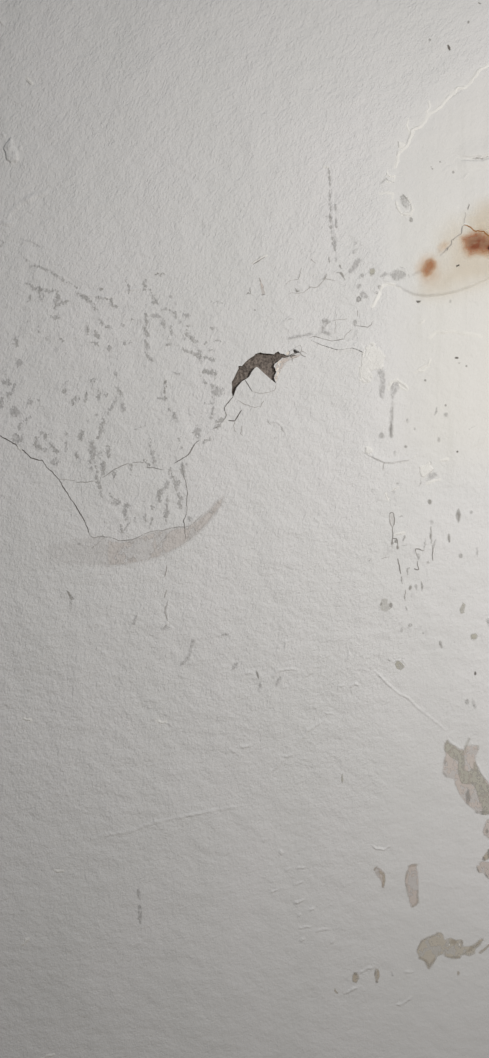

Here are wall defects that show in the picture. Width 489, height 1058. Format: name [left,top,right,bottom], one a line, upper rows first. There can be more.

corrosion [424,206,489,274]
spalling [25,266,373,444]
crack [0,397,264,541]
peeling [444,736,489,838]
peeling [418,933,489,966]